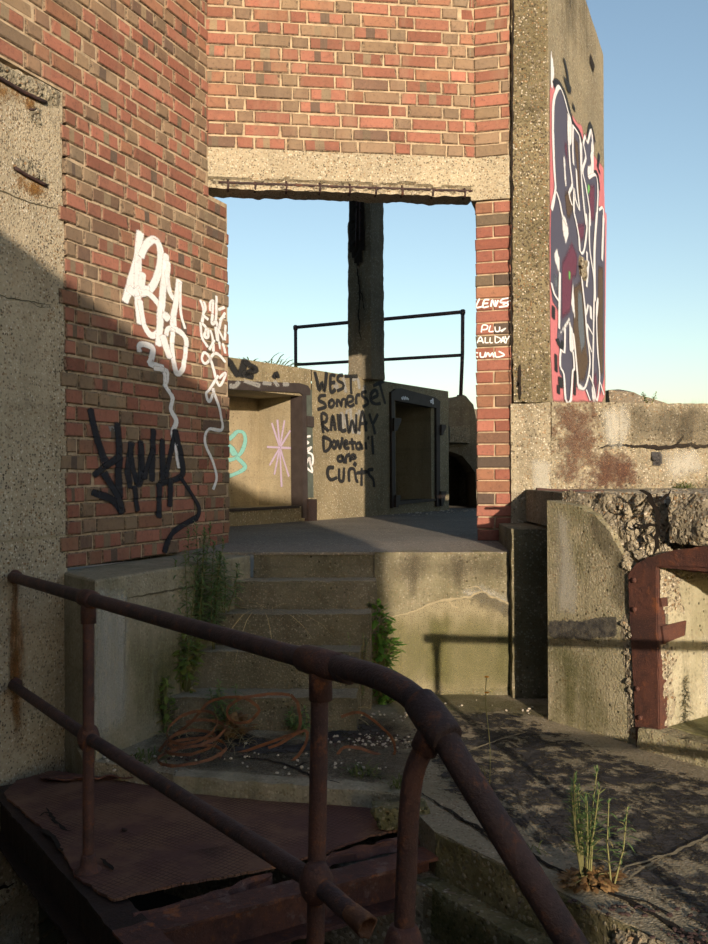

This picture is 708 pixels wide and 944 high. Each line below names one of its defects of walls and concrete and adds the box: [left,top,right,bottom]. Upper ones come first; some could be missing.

spalling [212,179,473,266]
crack [356,260,365,337]
crack [600,435,708,450]
crack [635,490,671,555]
rust [10,584,22,680]
crack [615,835,708,883]